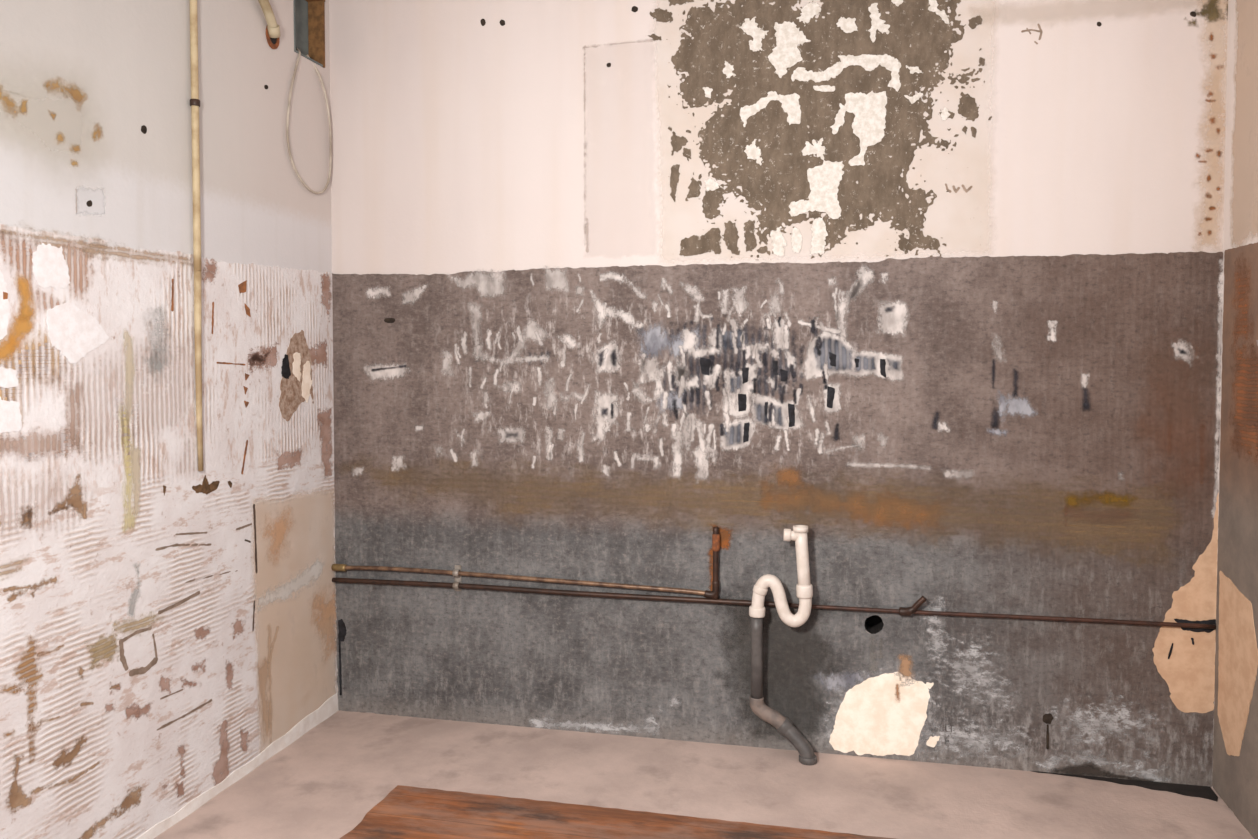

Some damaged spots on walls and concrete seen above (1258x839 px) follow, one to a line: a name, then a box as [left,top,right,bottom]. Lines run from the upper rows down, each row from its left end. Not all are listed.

corrosion [1196,0,1258,244]
flaking render [437,0,992,478]
peeling [32,243,110,364]
spalling [238,280,251,317]
peeling [0,367,22,434]
spalling [279,330,314,421]
spalling [192,440,248,495]
spalling [1152,259,1258,756]
spalling [3,577,57,602]
corrosion [708,525,731,591]
spalling [119,627,158,677]
spalling [79,787,142,839]